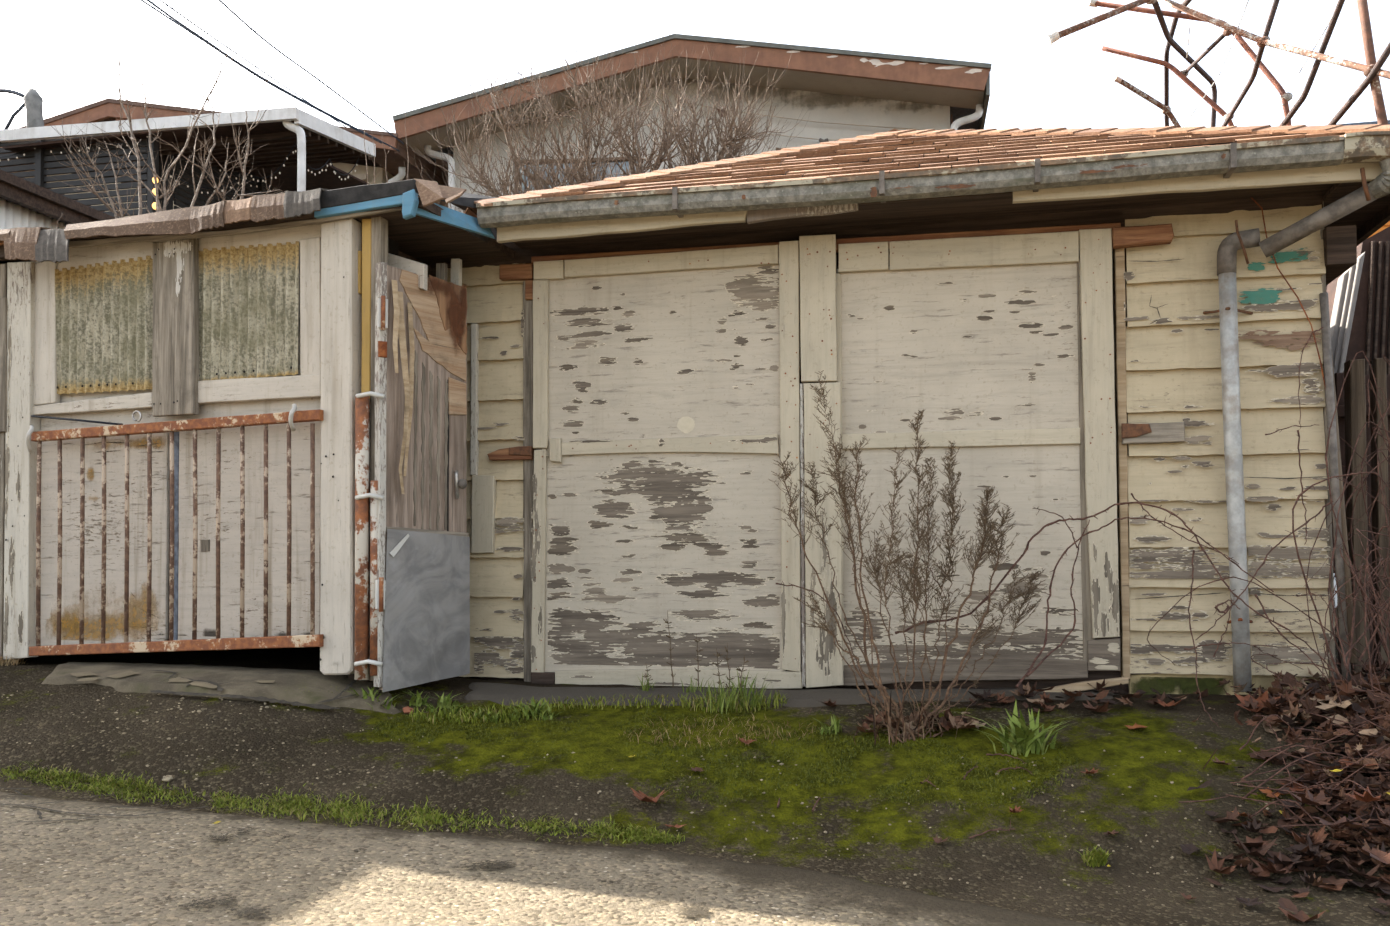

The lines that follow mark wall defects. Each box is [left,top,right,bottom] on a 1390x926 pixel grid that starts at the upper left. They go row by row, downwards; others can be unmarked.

peeling [1247,247,1320,271]
peeling [675,265,779,389]
peeling [1124,302,1220,333]
peeling [1239,283,1323,312]
peeling [550,293,654,443]
peeling [1238,330,1324,404]
peeling [474,439,786,685]